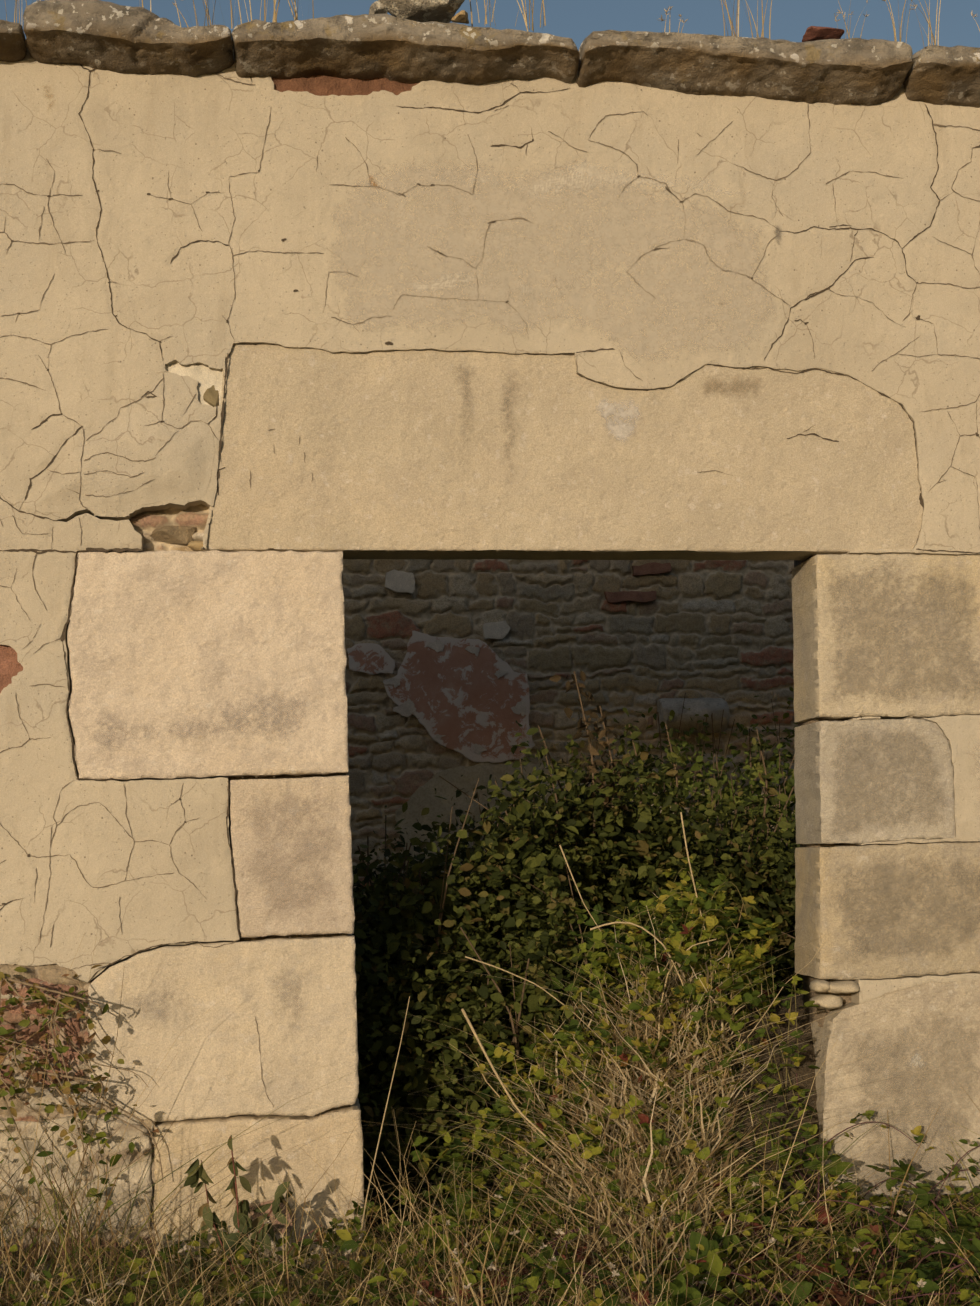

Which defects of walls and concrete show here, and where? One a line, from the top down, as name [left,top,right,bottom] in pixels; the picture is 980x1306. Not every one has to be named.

spalling [165,361,223,407]
spalling [129,504,209,552]
crack [0,64,980,983]
spalling [0,645,23,693]
flaking render [347,631,535,763]
spalling [0,964,157,1301]